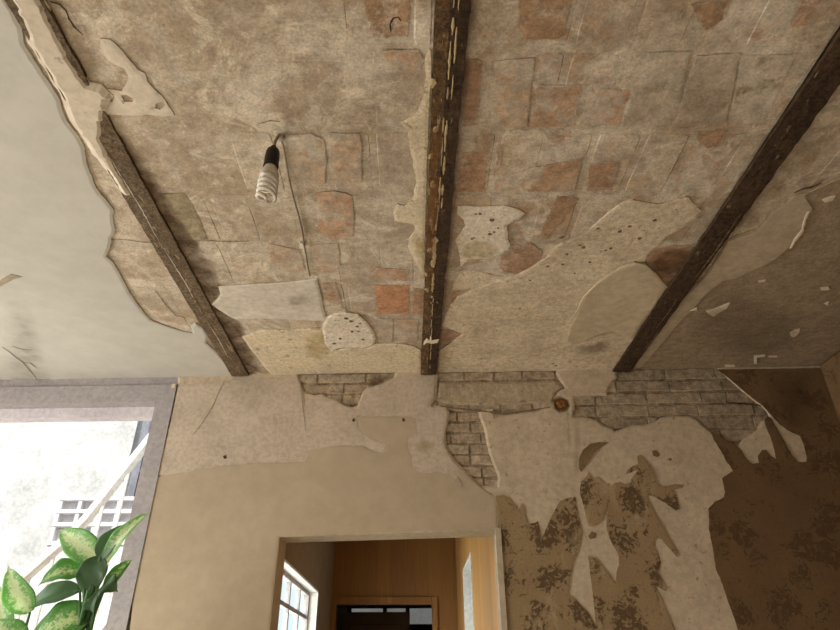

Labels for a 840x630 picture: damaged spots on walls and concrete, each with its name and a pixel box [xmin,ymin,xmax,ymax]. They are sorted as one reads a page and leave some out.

spalling [0,0,437,380]
peeling [130,85,840,630]
spalling [441,0,840,324]